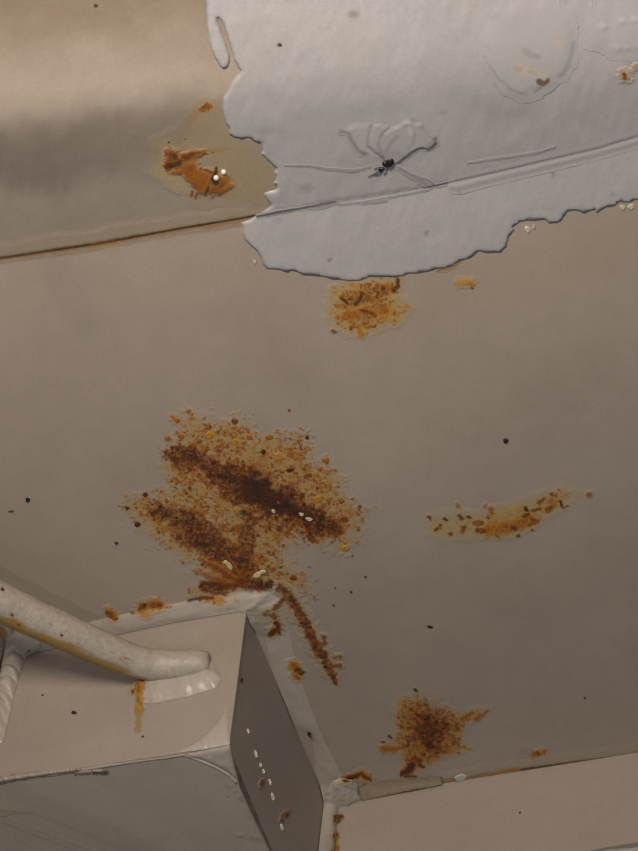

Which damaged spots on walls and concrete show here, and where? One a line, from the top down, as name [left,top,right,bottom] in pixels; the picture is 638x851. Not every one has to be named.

rust [0,95,277,267]
rust [320,273,419,344]
rust [100,400,378,687]
rust [419,480,595,549]
rust [131,679,145,715]
rust [373,685,638,784]